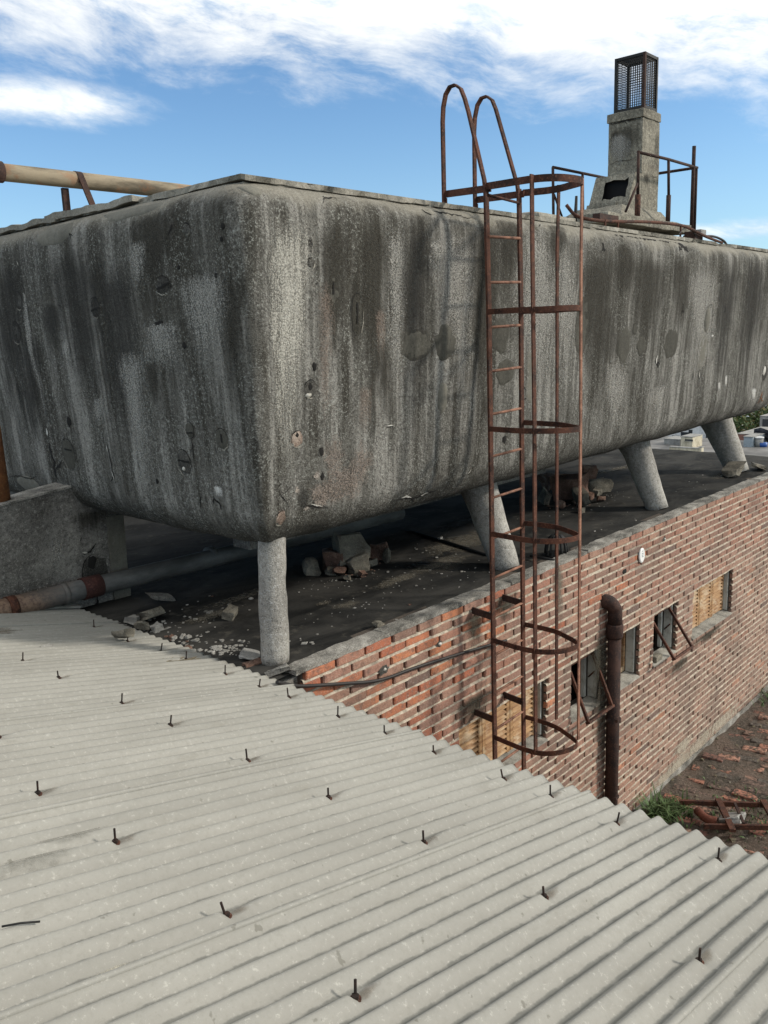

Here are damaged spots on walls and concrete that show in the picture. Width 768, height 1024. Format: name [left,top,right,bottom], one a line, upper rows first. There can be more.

damp [0,268,42,427]
damp [43,215,176,463]
damp [182,277,243,364]
damp [268,228,308,441]
damp [323,220,763,424]
spalling [177,421,195,476]
spalling [290,430,303,448]